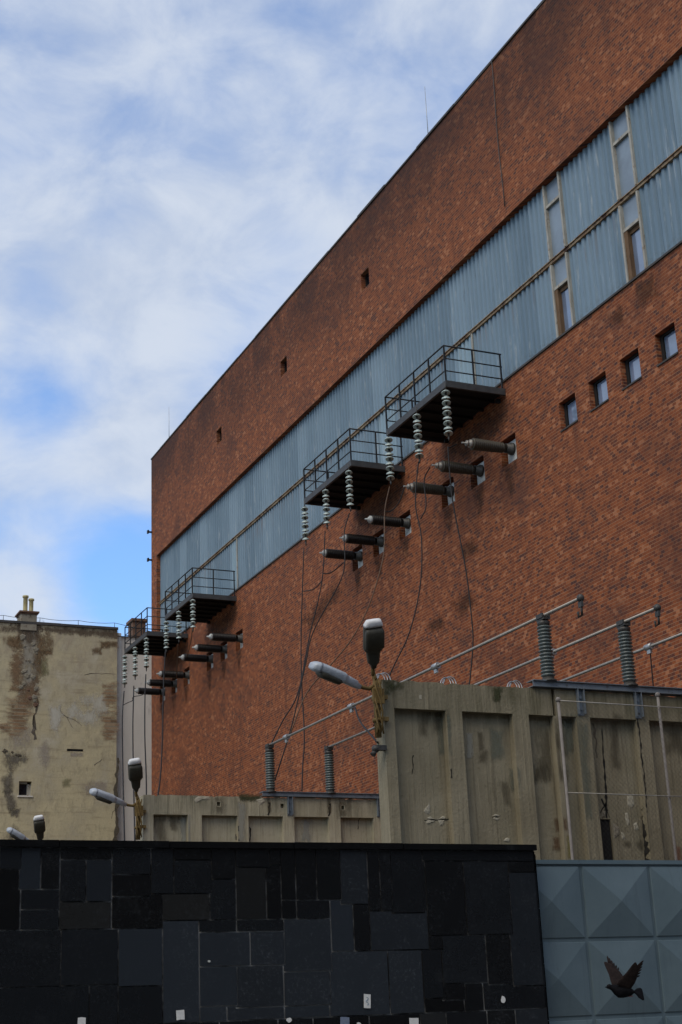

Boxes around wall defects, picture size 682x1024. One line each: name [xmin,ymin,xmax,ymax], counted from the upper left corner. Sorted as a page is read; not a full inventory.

peeling [0,627,40,735]
crack [31,698,81,740]
spalling [2,748,26,817]
crack [592,723,609,818]
crack [637,718,650,860]